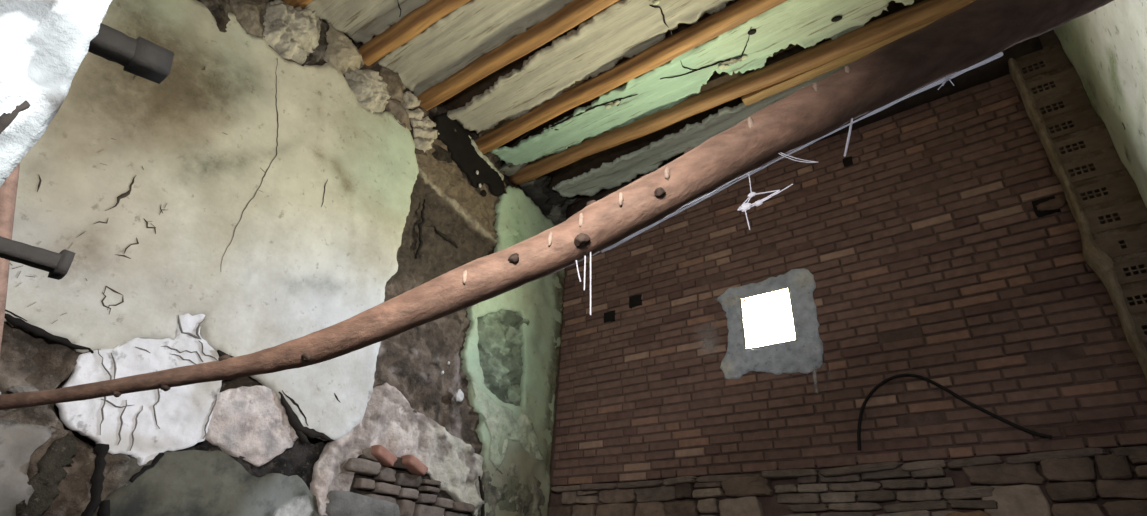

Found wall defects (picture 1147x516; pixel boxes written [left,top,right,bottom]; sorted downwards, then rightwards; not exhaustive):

crack [221,58,279,264]
spalling [197,0,577,302]
peeling [718,56,748,69]
peeling [0,302,545,516]